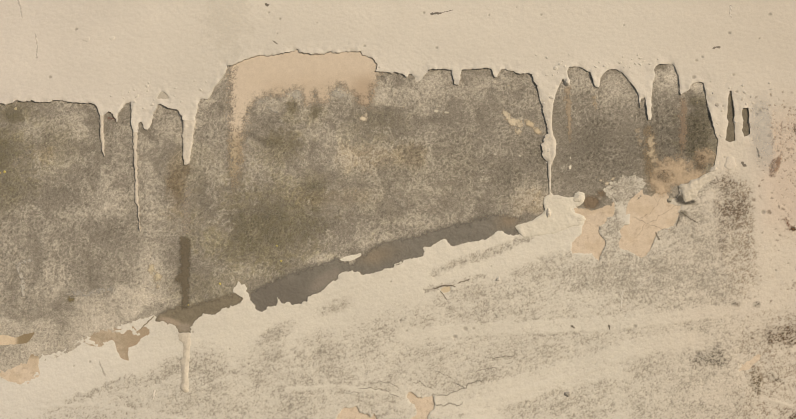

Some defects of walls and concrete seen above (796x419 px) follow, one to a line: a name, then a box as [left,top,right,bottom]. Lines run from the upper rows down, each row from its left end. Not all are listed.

water stain [175,192,191,309]
peeling [0,49,750,384]
water stain [584,191,605,208]
water stain [635,128,715,205]